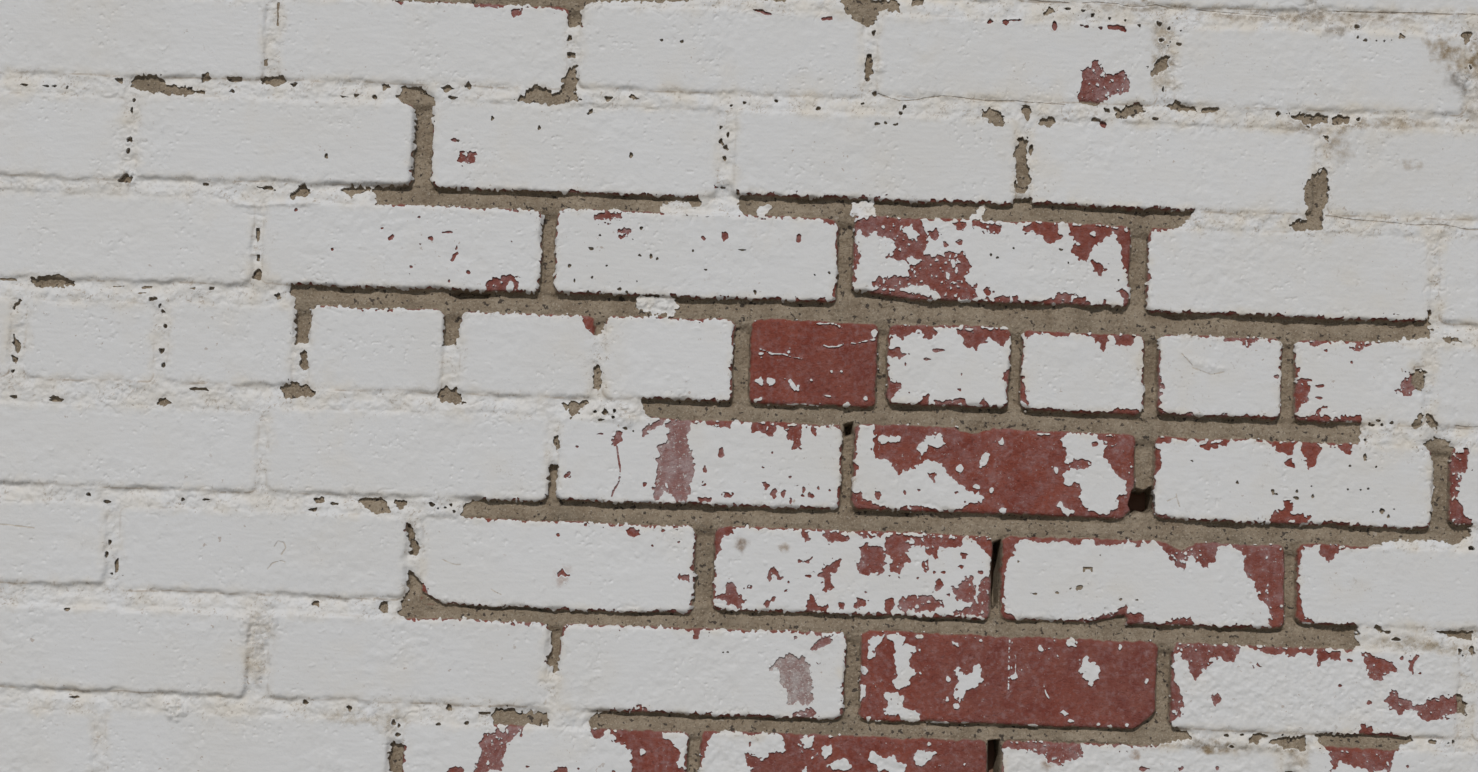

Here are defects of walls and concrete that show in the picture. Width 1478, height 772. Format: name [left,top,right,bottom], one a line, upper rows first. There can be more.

spalling [116,72,242,114]
spalling [261,59,298,87]
peeling [1043,7,1219,128]
spalling [258,184,311,212]
spalling [252,228,262,281]
spalling [0,274,75,288]
spalling [12,334,21,373]
peeling [275,82,1474,772]